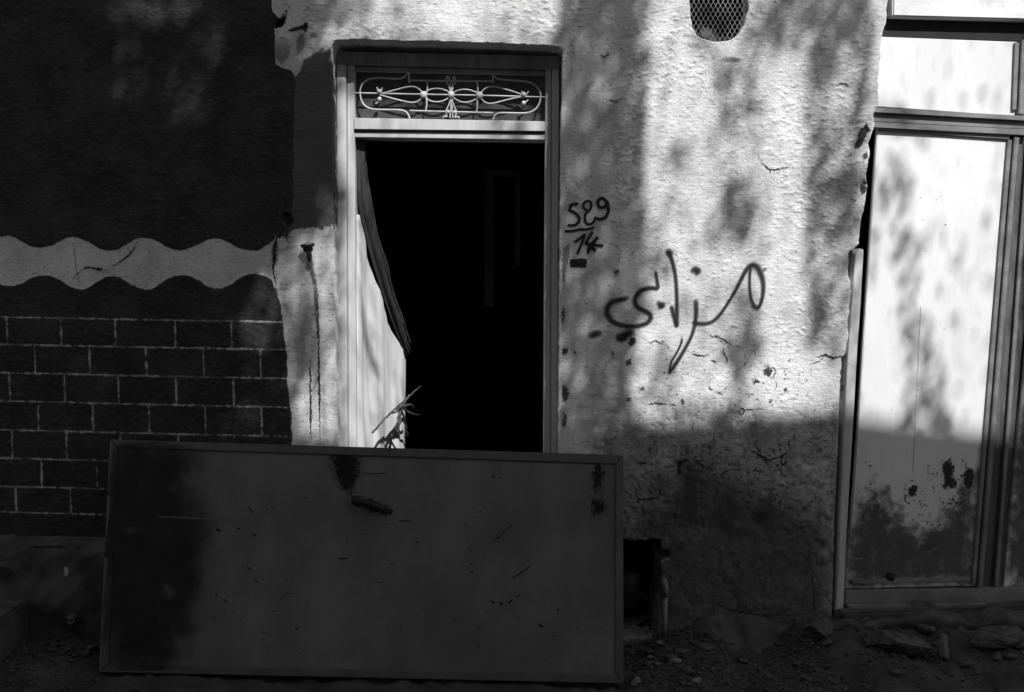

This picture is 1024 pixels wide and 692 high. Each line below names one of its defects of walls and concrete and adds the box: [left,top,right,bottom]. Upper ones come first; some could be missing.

peeling [274,4,317,77]
crack [72,231,142,301]
crack [805,354,849,398]
crack [686,440,796,476]